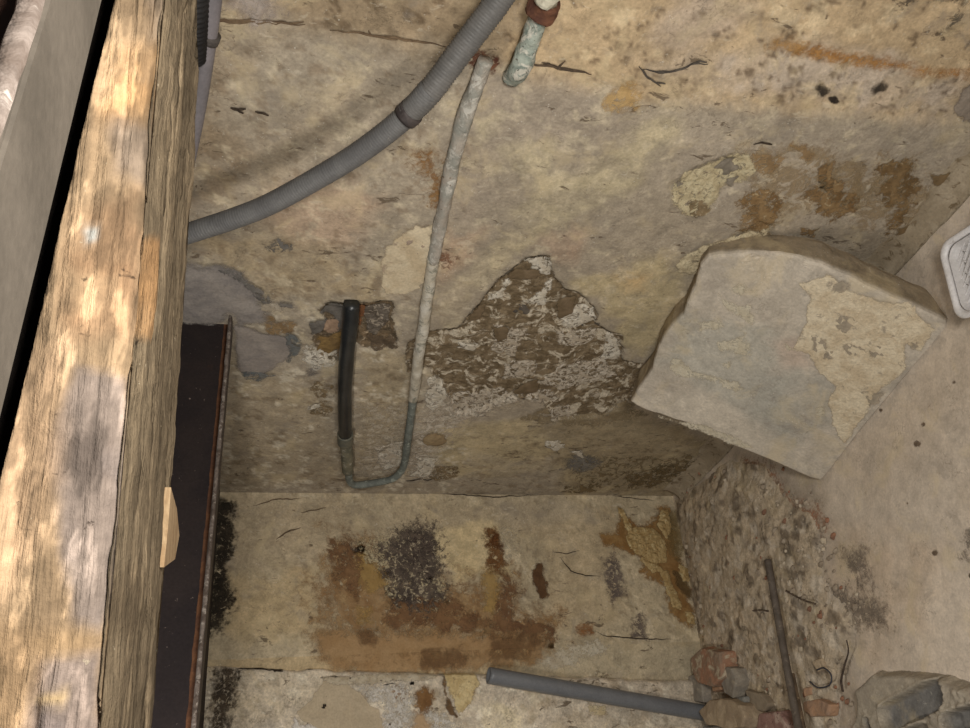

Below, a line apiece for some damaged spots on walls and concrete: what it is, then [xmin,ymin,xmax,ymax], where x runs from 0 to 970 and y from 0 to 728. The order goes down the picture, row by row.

crack [220,18,305,26]
crack [330,30,445,47]
corrosion [774,41,966,77]
peeling [671,153,756,218]
spalling [309,302,343,360]
flaking render [356,255,644,419]
leakage [344,517,452,619]